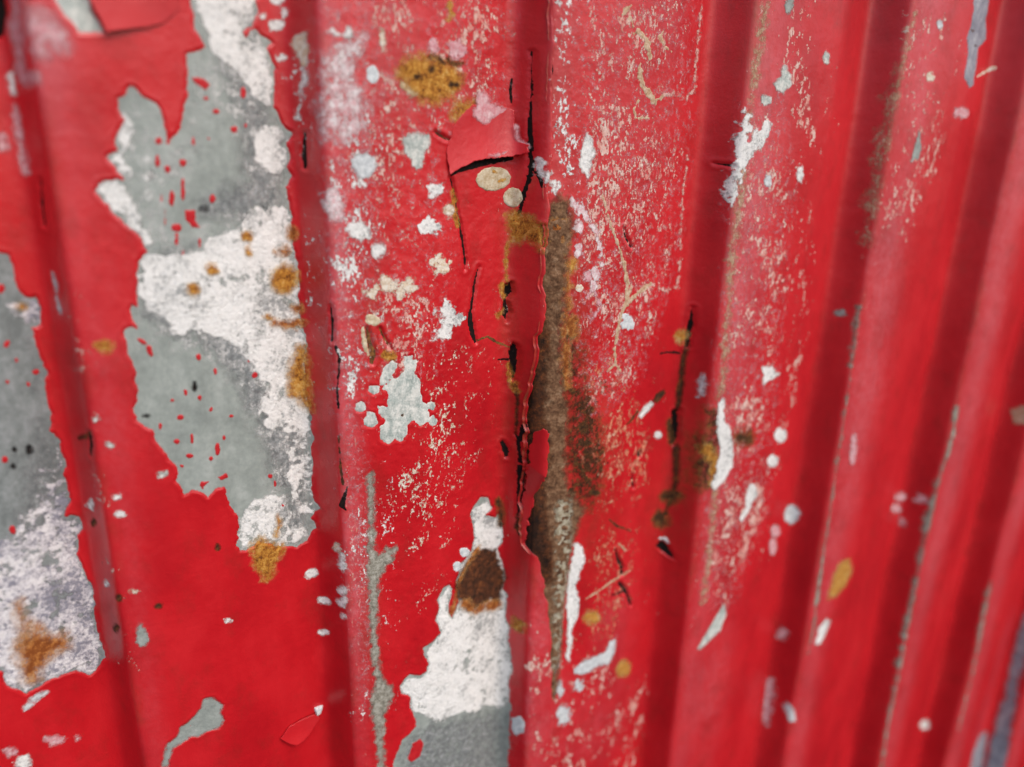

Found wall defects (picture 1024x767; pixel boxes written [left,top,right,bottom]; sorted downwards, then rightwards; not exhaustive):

crack [509,51,553,247]
rust [14,601,68,683]
peeling [0,253,138,711]
peeling [0,0,694,619]
rust [450,546,507,614]
crack [450,178,509,348]
crack [500,384,528,536]
peeling [391,497,649,767]
rust [496,194,609,699]
crack [660,311,694,412]
rust [689,408,719,491]
peeling [687,0,834,654]